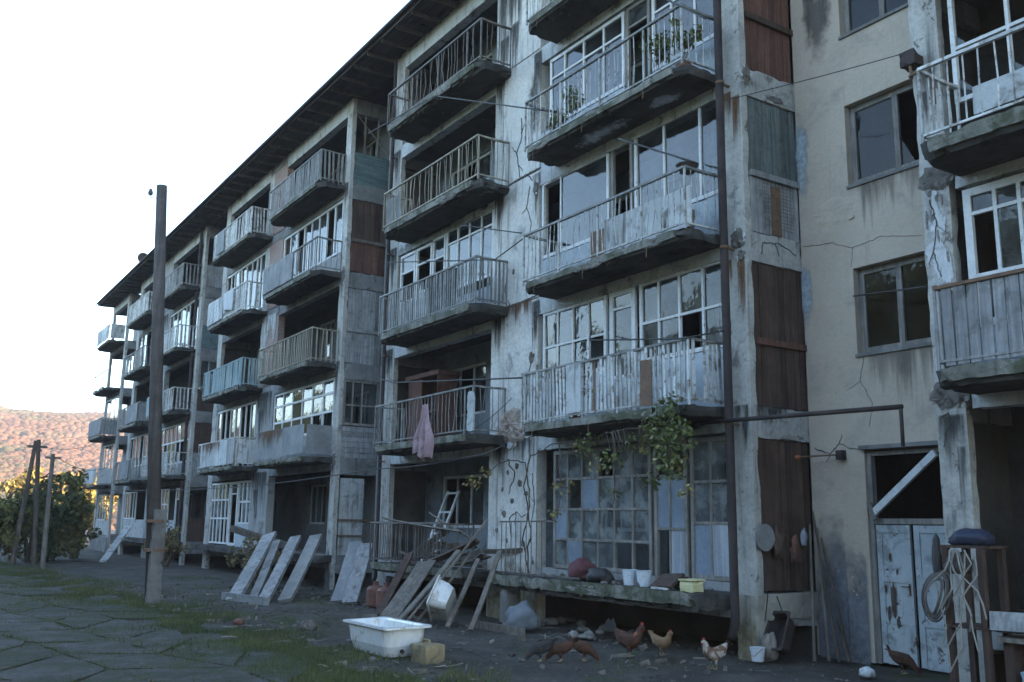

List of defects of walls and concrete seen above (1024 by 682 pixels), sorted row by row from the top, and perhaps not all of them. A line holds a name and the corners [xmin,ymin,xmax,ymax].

damp [803,0,826,45]
crack [506,118,541,240]
crack [761,236,890,263]
crack [917,199,947,277]
peeling [917,167,955,283]